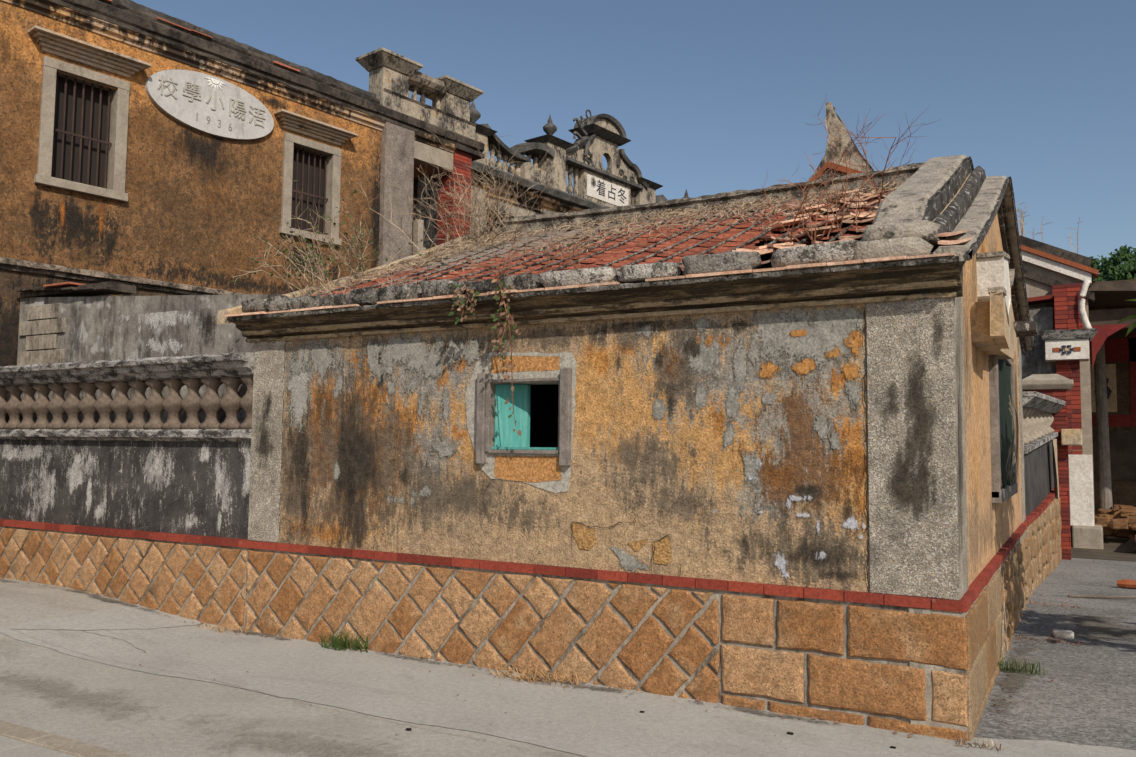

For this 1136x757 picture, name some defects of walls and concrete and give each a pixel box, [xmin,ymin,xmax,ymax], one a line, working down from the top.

water stain [32,194,91,252]
water stain [934,307,944,355]
peeling [285,333,490,437]
peeling [652,398,667,421]
peeling [685,308,864,491]
water stain [876,357,937,519]
water stain [336,391,380,547]
peeling [386,486,450,508]
spalling [572,523,596,550]
spalling [610,536,672,573]